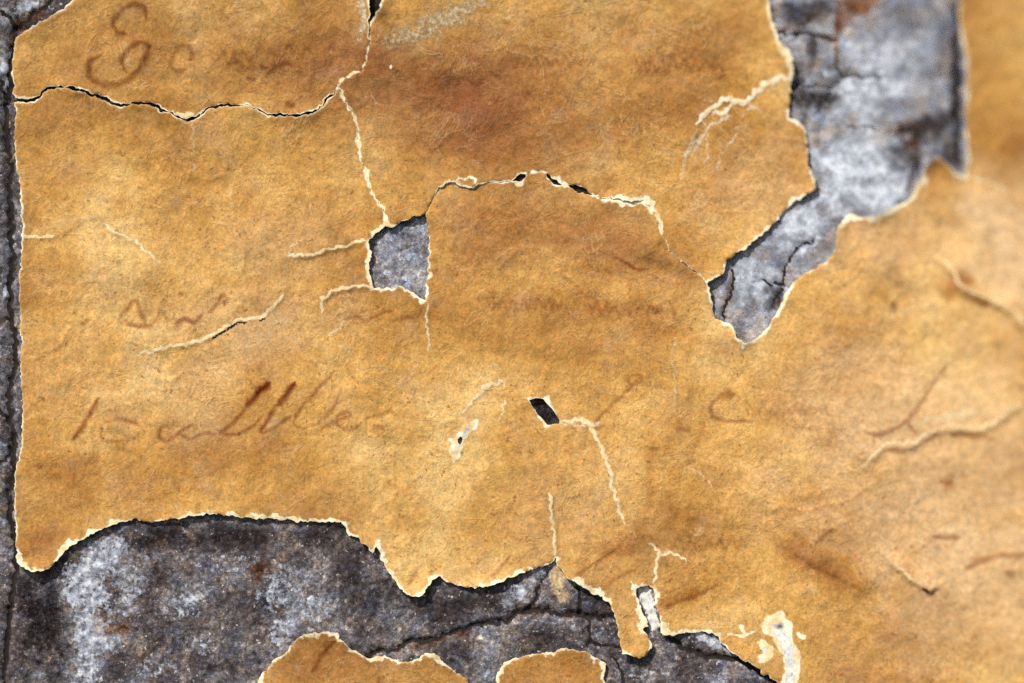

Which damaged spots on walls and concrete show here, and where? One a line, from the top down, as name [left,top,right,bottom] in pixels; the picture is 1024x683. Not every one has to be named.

peeling [767,11,943,256]
crack [513,174,592,195]
crack [722,269,735,319]
peeling [722,257,778,312]
crack [0,0,336,683]
peeling [448,419,479,463]
peeling [56,534,178,683]
peeling [154,582,215,618]
peeling [221,549,336,647]
peeling [502,563,575,608]
peeling [638,585,661,637]
peeling [690,611,806,683]